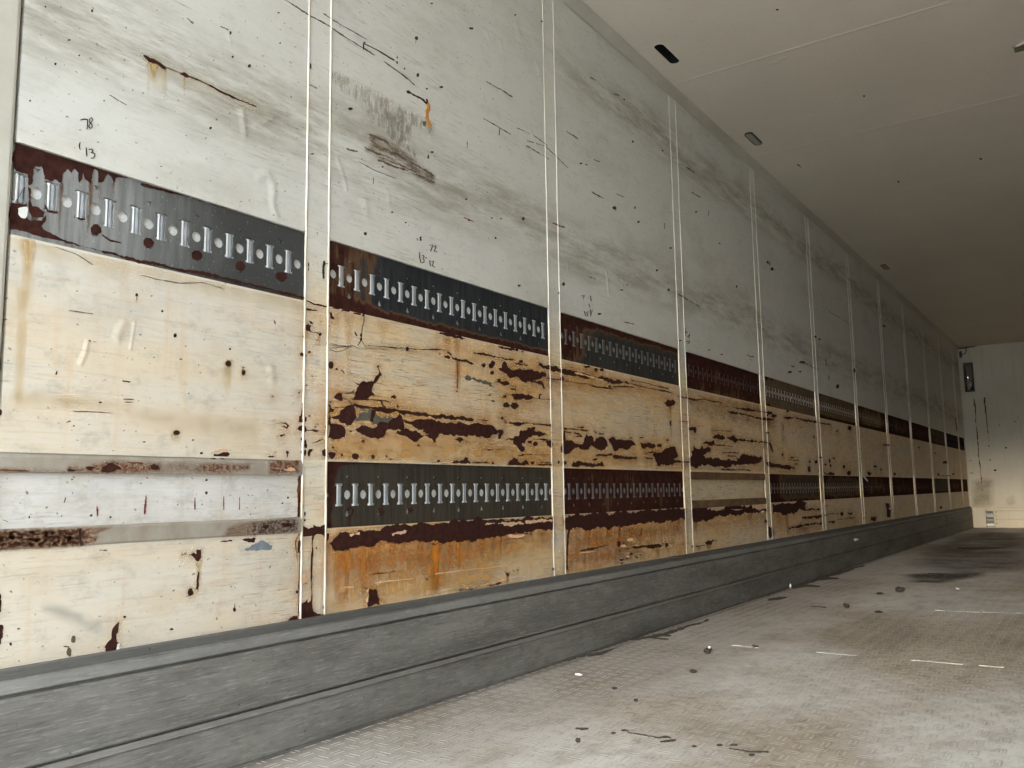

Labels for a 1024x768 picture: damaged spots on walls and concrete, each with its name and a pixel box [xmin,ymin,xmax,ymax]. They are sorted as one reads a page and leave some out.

corrosion [406,90,432,128]
corrosion [9,139,365,356]
peeling [465,375,495,403]
corrosion [67,461,180,473]
corrosion [199,448,249,473]
corrosion [229,346,855,621]
corrosion [0,528,107,551]